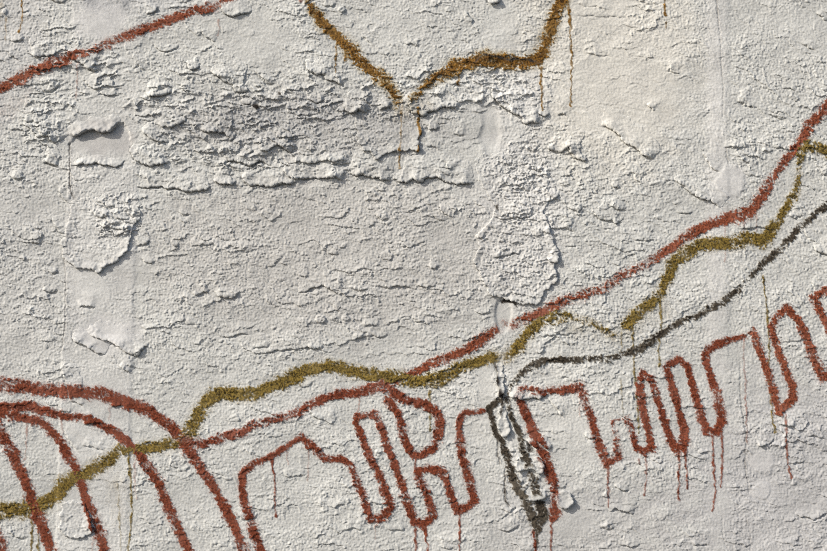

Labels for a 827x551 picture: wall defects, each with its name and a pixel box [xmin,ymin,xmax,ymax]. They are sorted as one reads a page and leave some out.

peeling [67,114,122,137]
peeling [72,319,148,357]
crack [494,364,504,415]